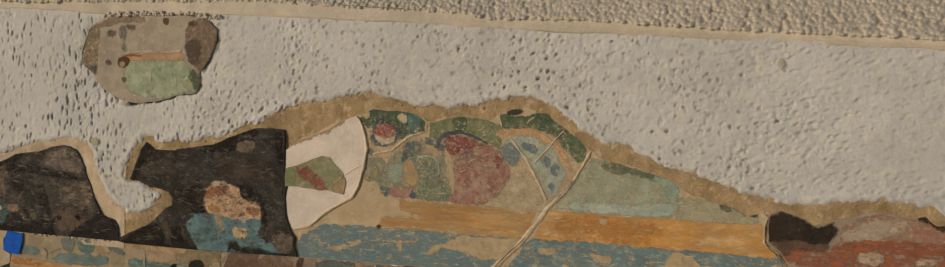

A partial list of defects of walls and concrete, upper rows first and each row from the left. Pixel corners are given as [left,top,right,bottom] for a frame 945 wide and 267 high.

crack [491,130,591,267]